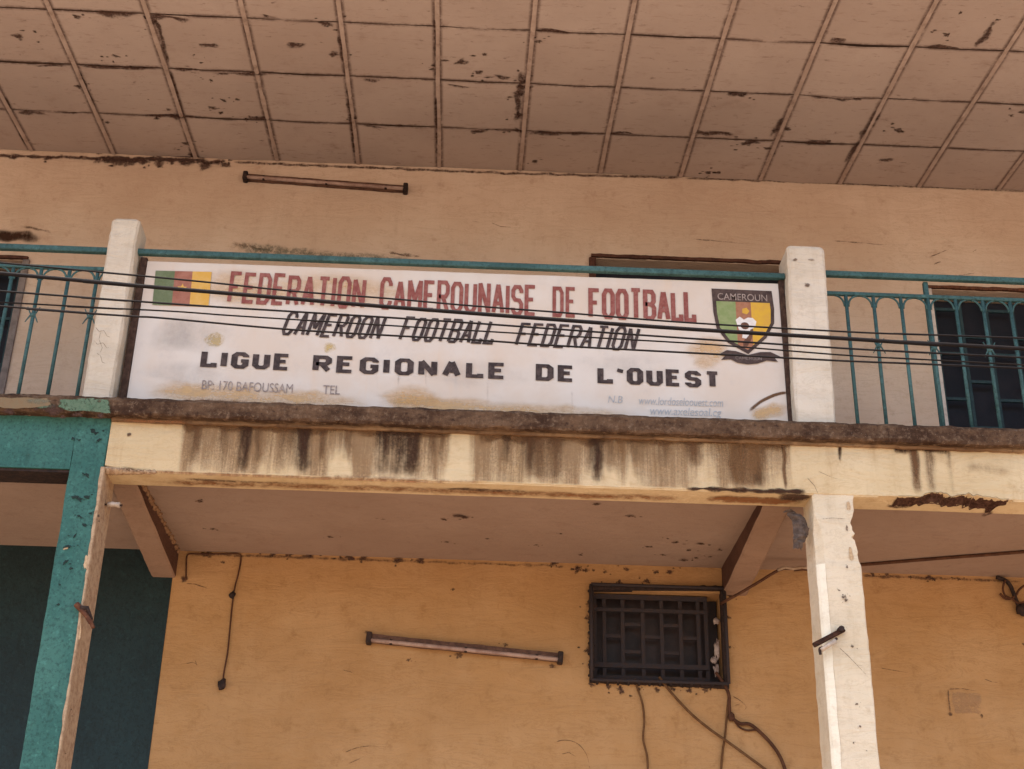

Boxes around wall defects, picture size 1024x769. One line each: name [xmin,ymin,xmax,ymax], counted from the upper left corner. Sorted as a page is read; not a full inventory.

peeling [0,397,110,413]
leakage [182,424,449,477]
leakage [474,435,790,486]
spalling [888,492,1008,516]